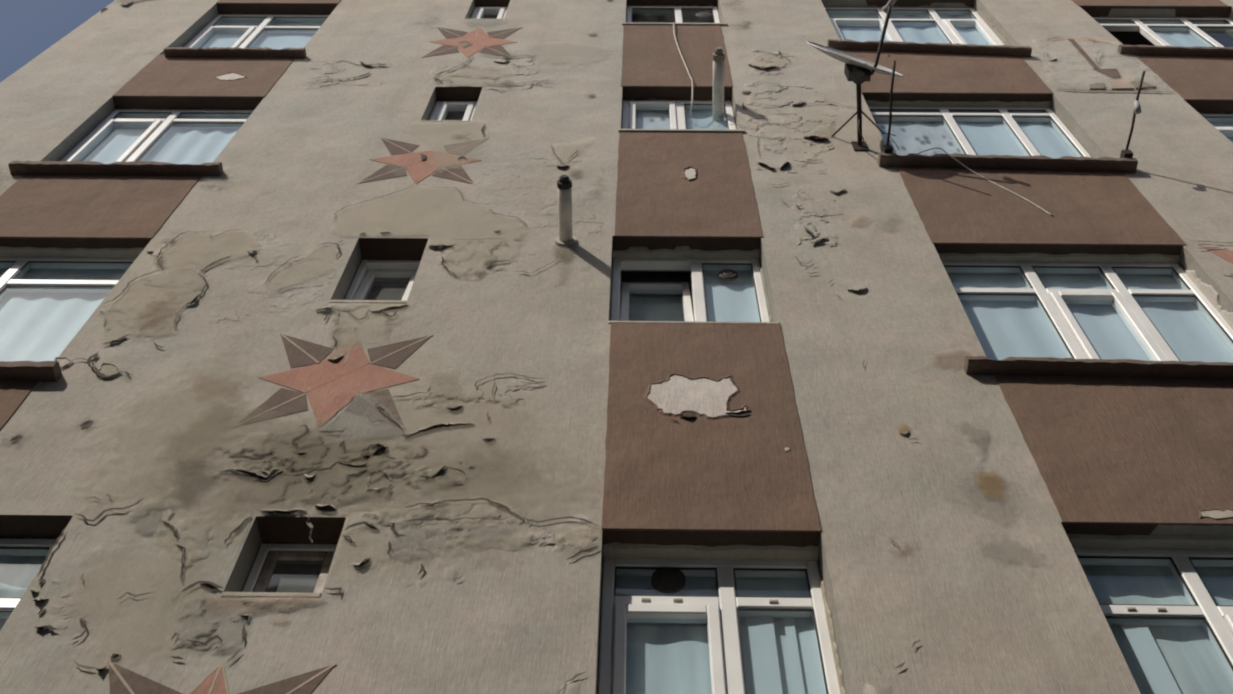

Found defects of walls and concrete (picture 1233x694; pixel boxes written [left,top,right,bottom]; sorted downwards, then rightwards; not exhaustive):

peeling [729,49,840,175]
peeling [428,144,608,282]
peeling [791,188,849,272]
peeling [54,228,266,380]
peeling [393,373,543,421]
peeling [644,373,751,422]
peeling [30,526,67,631]
peeling [111,395,599,661]
spalling [1199,509,1233,520]